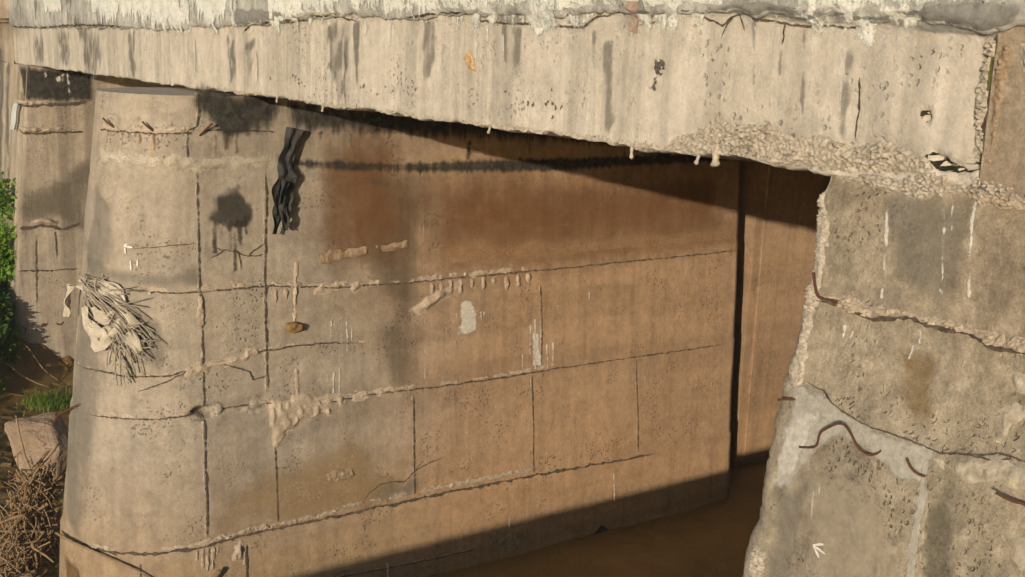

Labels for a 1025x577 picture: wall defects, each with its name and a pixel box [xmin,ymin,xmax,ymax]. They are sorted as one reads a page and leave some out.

damp [624,0,653,34]
spalling [204,86,1025,401]
crack [808,382,1025,462]
spalling [746,535,767,577]